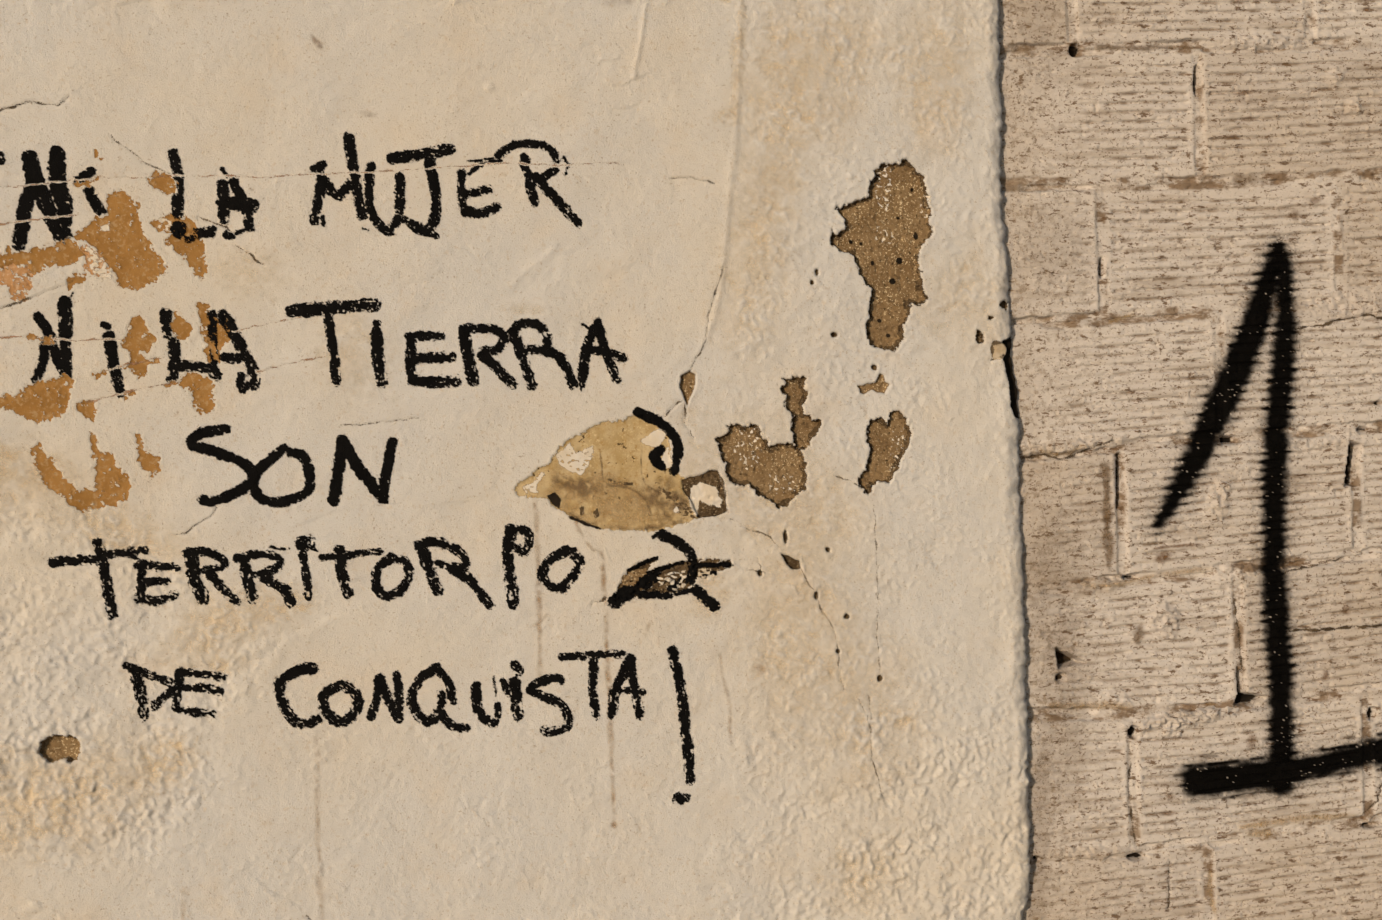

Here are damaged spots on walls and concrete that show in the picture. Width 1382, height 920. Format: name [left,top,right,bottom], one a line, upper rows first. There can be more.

crack [0,97,68,112]
peeling [0,149,208,302]
crack [201,218,261,264]
spalling [830,159,933,351]
peeling [26,333,55,345]
crack [0,295,175,403]
peeling [120,298,231,415]
spalling [858,365,889,394]
peeling [0,373,161,513]
spalling [515,371,821,532]
spalling [858,411,911,494]
crack [709,470,771,572]